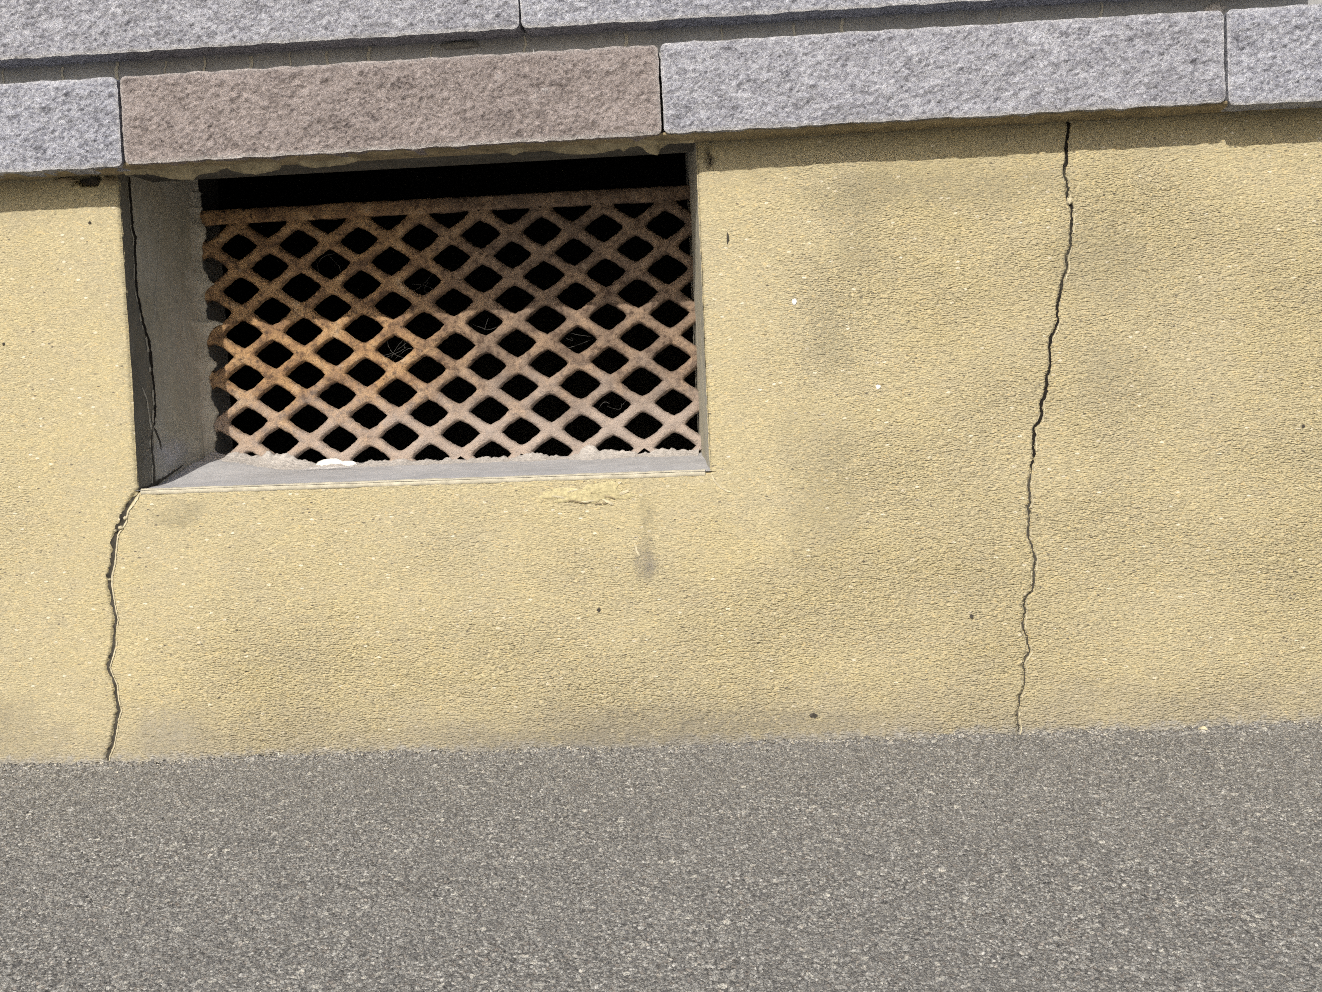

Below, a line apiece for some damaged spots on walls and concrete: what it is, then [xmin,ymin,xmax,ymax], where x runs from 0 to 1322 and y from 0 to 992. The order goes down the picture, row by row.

crack [106,177,183,761]
crack [1014,121,1075,735]